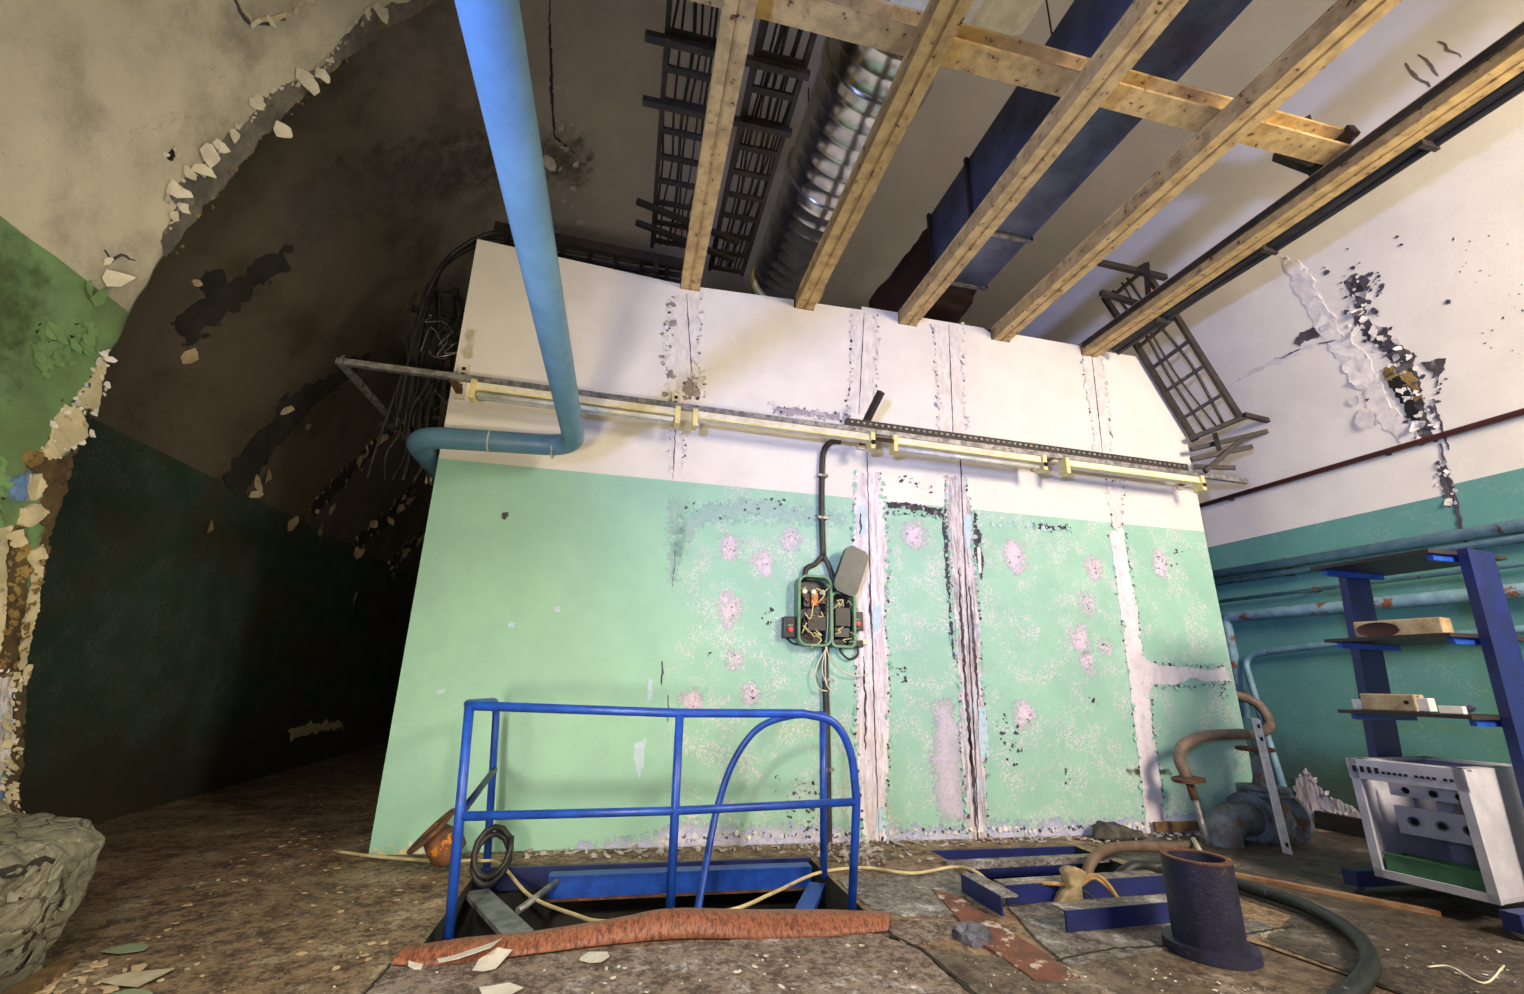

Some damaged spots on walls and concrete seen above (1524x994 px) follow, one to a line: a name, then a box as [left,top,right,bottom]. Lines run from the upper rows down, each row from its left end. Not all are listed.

spalling [160,0,437,257]
spalling [0,249,137,814]
peeling [171,244,295,364]
peeling [218,352,376,500]
peeling [851,460,1074,842]
spalling [1323,248,1467,542]
peeling [0,853,70,975]
spalling [775,774,820,832]